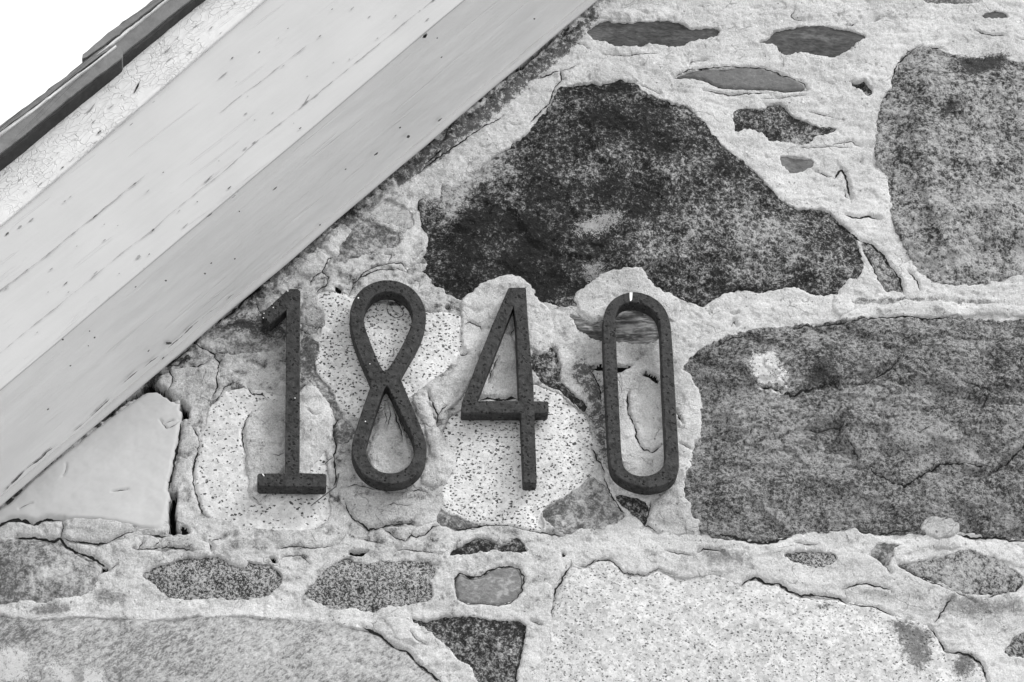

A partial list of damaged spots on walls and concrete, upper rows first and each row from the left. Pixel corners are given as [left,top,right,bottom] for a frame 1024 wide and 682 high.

crack [0,447,218,571]
crack [160,420,204,515]
crack [742,561,1023,682]